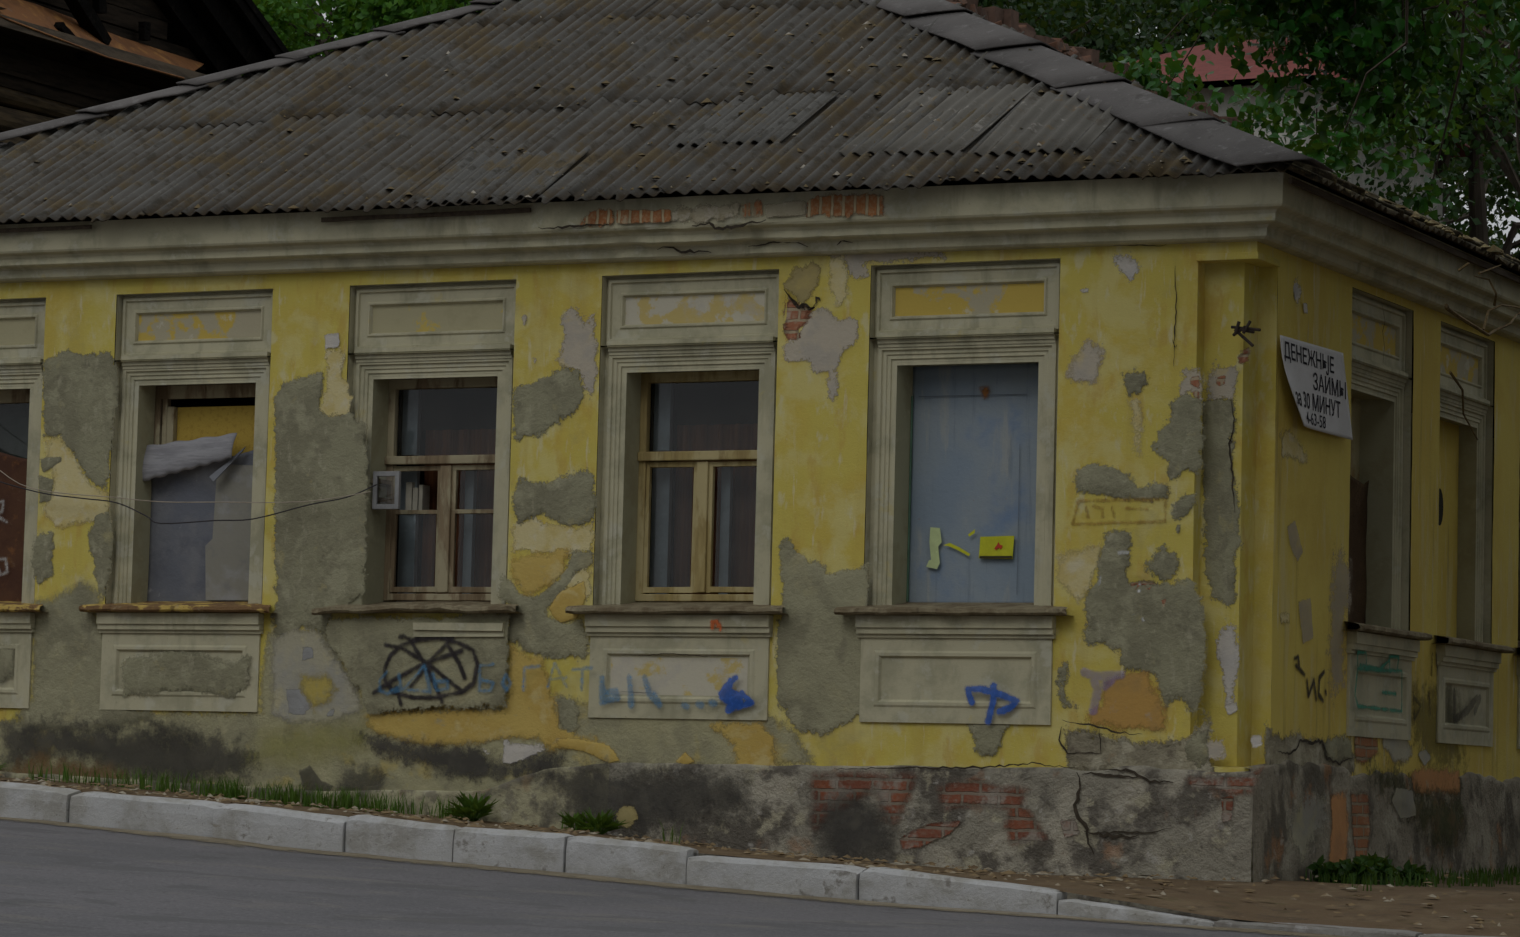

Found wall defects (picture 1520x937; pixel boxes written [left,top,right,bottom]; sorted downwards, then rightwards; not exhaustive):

flaking render [580,193,884,228]
peeling [782,252,947,402]
peeling [319,333,353,417]
peeling [1179,348,1251,401]
peeling [38,436,110,529]
crack [834,720,1173,855]